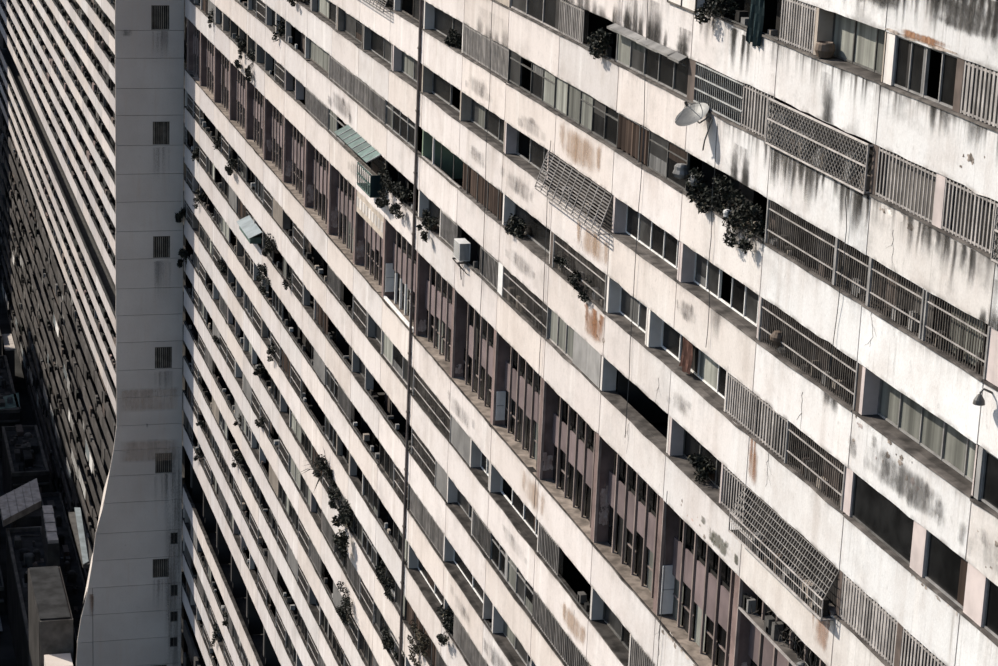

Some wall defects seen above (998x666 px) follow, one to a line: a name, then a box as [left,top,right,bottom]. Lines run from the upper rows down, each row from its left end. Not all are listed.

leakage [565,0,687,56]
leakage [873,0,998,38]
leakage [765,143,869,219]
leakage [909,217,975,271]
rust [586,303,603,340]
leakage [979,314,998,331]
leakage [881,454,932,509]